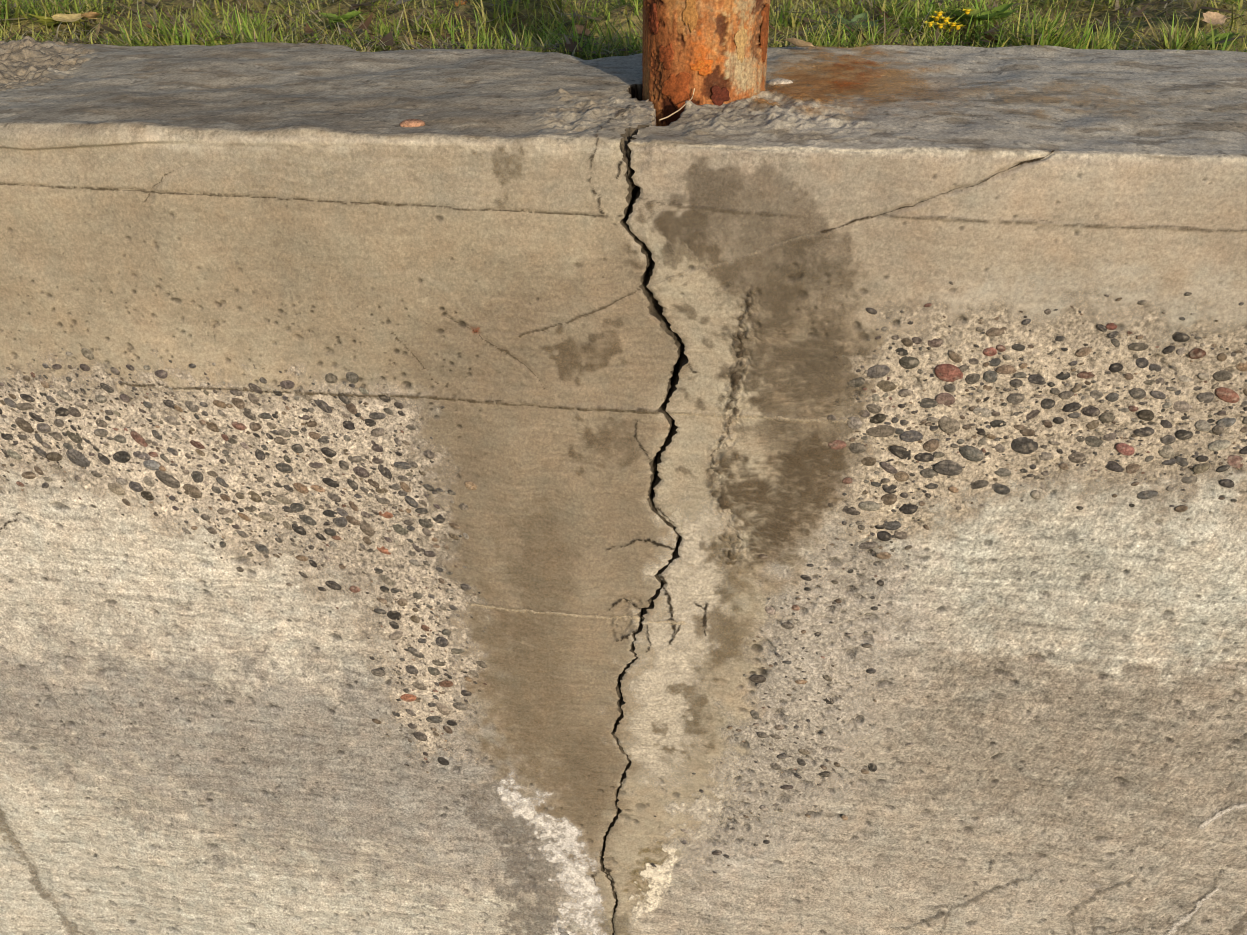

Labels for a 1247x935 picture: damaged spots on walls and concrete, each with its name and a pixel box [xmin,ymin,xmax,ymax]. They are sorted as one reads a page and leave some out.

corrosion [758,47,925,104]
water stain [542,326,620,382]
crack [589,105,708,935]
water stain [615,158,868,786]
water stain [466,756,740,935]